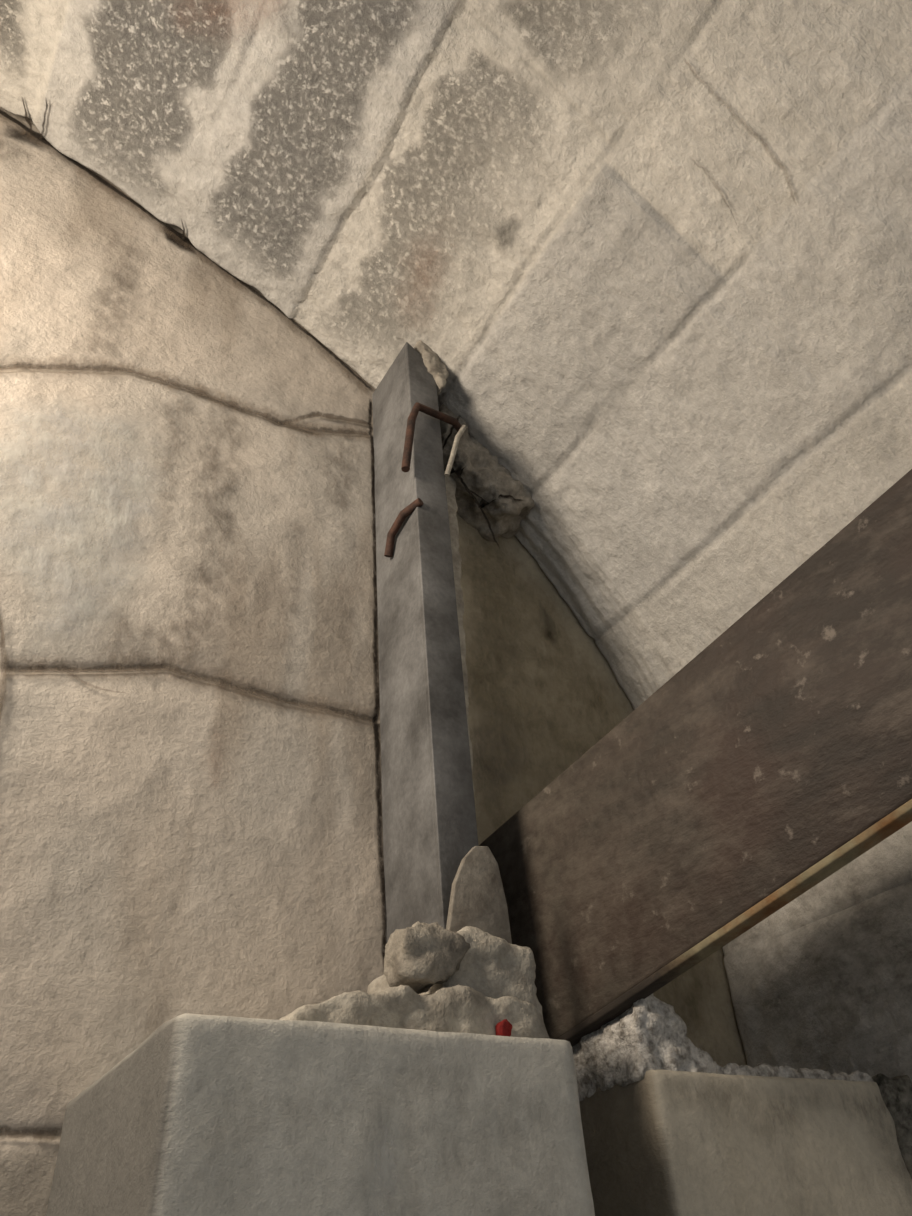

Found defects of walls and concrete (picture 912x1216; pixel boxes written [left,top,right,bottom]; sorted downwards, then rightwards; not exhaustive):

crack [0,99,387,965]